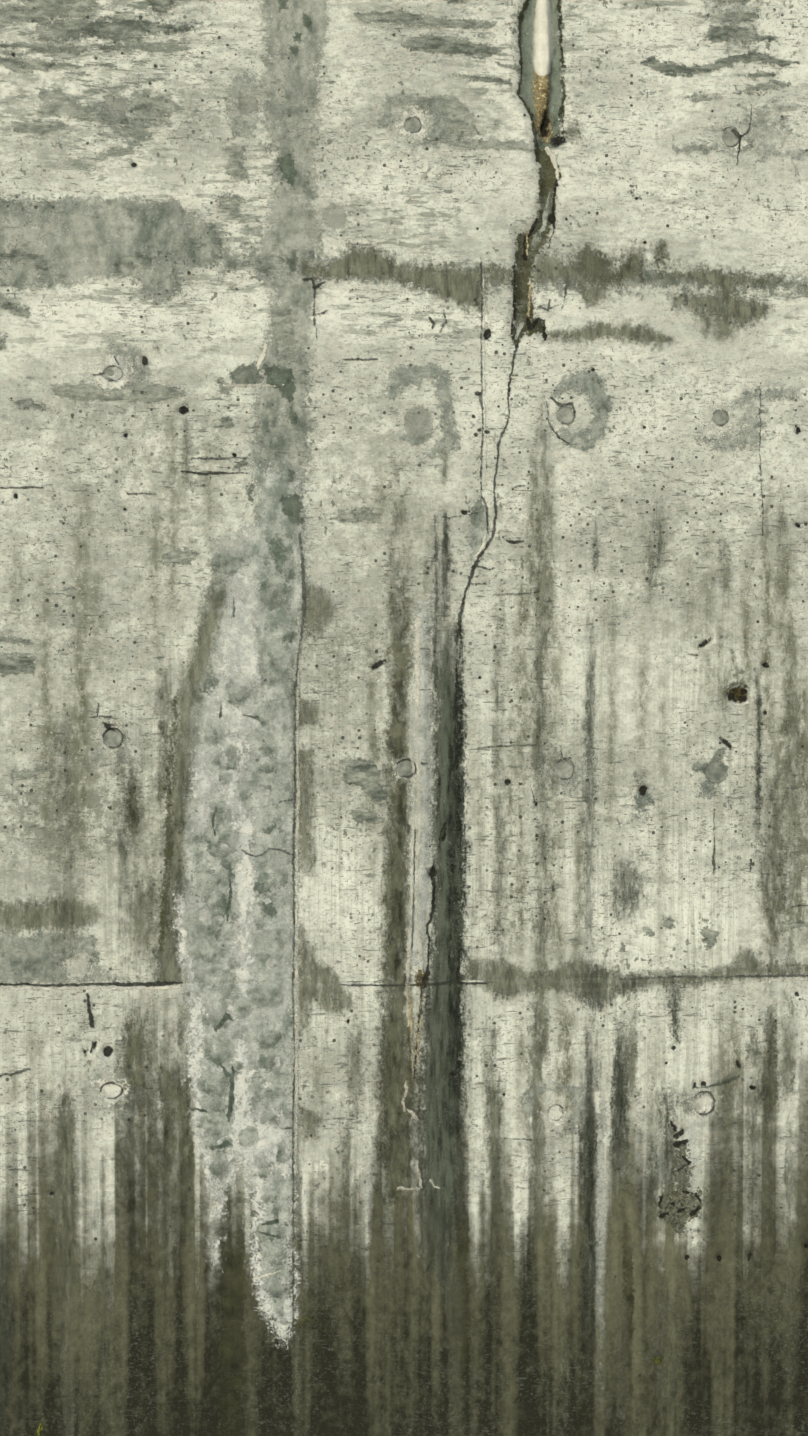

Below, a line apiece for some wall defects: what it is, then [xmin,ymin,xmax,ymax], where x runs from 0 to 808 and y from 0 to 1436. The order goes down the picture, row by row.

leakage [223,143,249,180]
crack [428,0,576,643]
leakage [531,239,808,345]
leakage [431,513,452,587]
leakage [531,478,551,819]
leakage [581,661,596,824]
leakage [754,676,762,820]
leakage [492,727,505,945]
leakage [613,863,643,917]
leakage [758,779,798,956]
leakage [625,1038,638,1087]
leakage [780,1026,796,1093]